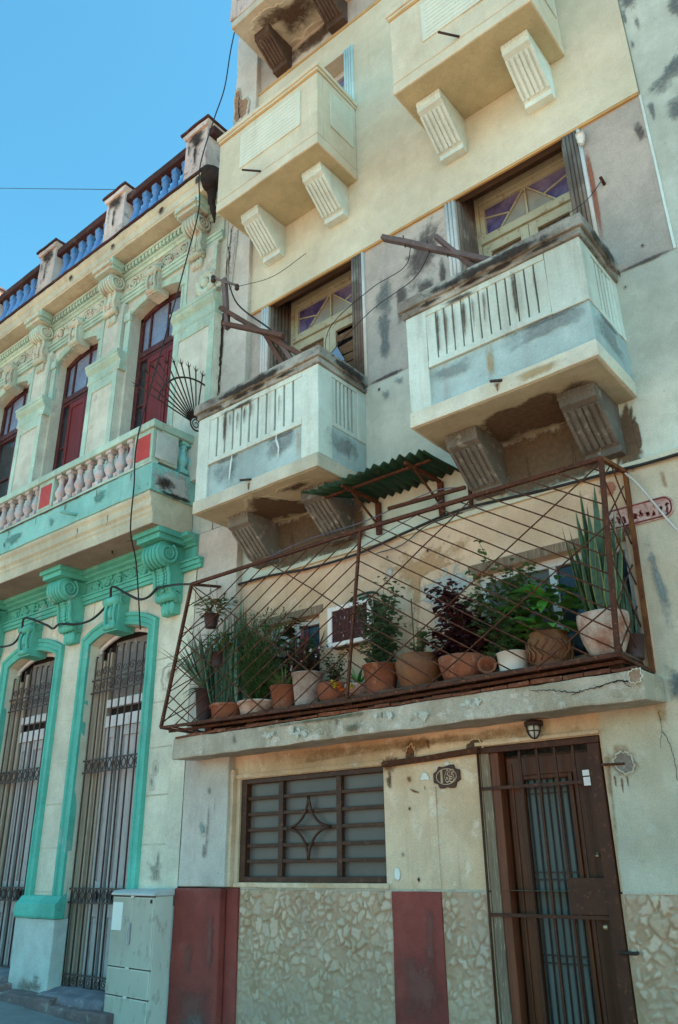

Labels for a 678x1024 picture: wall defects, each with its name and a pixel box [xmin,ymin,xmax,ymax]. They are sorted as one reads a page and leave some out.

spalling [246,0,323,45]
mould [651,56,678,90]
water stain [376,225,556,355]
water stain [524,310,579,340]
water stain [599,315,620,353]
water stain [270,430,292,454]
water stain [632,421,642,447]
water stain [154,470,189,502]
crack [530,680,631,695]
spalling [627,667,643,685]
crack [658,712,678,780]
spalling [611,750,636,775]